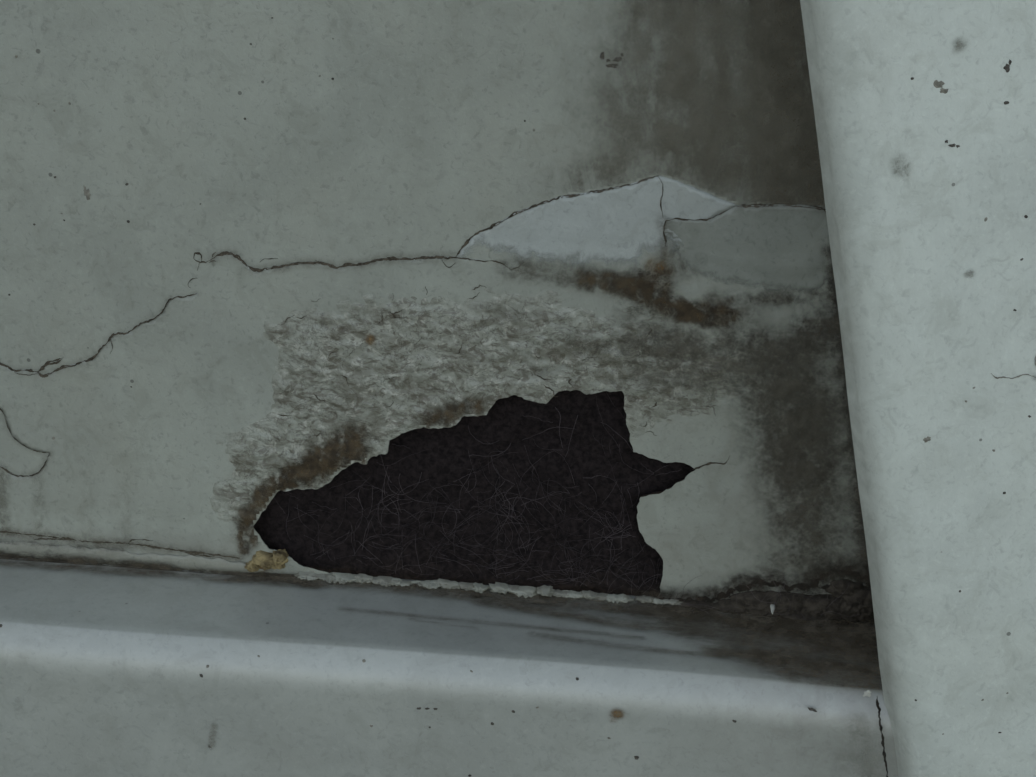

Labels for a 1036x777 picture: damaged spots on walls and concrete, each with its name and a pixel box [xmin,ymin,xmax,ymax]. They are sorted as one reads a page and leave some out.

leakage [752,0,825,206]
crack [0,175,826,378]
corrosion [577,252,736,327]
crack [0,409,49,477]
peeling [0,293,213,518]
crack [693,456,730,470]
leakage [626,248,871,588]
crack [0,531,239,564]
peeling [294,571,682,605]